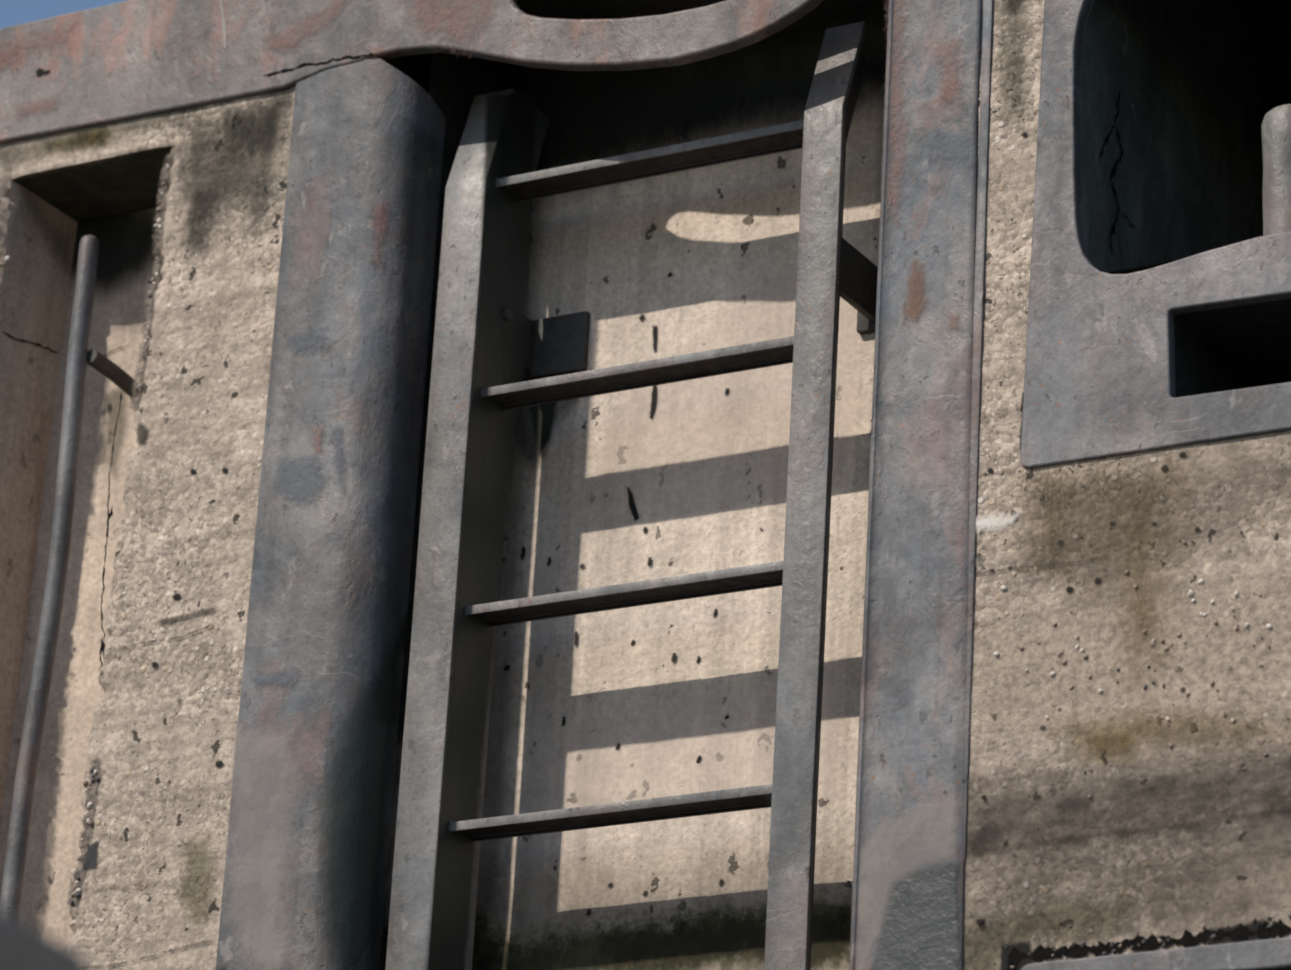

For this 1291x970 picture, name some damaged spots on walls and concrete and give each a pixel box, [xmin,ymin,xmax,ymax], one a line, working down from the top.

crack [262,53,375,76]
crack [1099,89,1136,254]
crack [2,331,58,353]
crack [99,392,214,672]